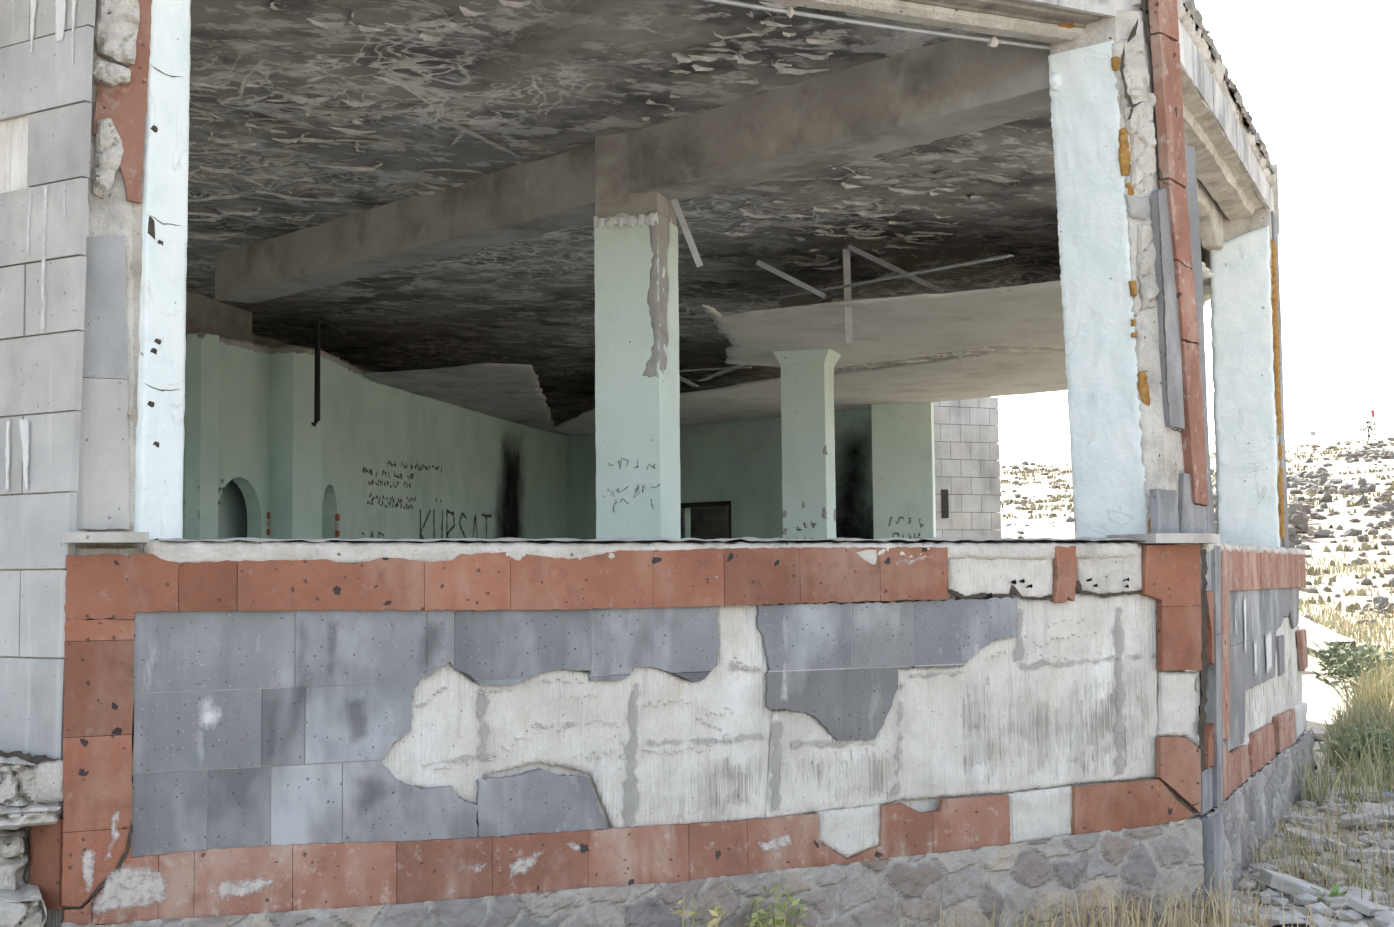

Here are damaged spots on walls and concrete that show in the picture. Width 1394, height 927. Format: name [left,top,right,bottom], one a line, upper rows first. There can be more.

peeling [306,0,485,42]
peeling [92,0,428,246]
peeling [379,168,489,198]
spalling [593,210,672,380]
spalling [382,546,1199,858]
spalling [1229,617,1307,752]